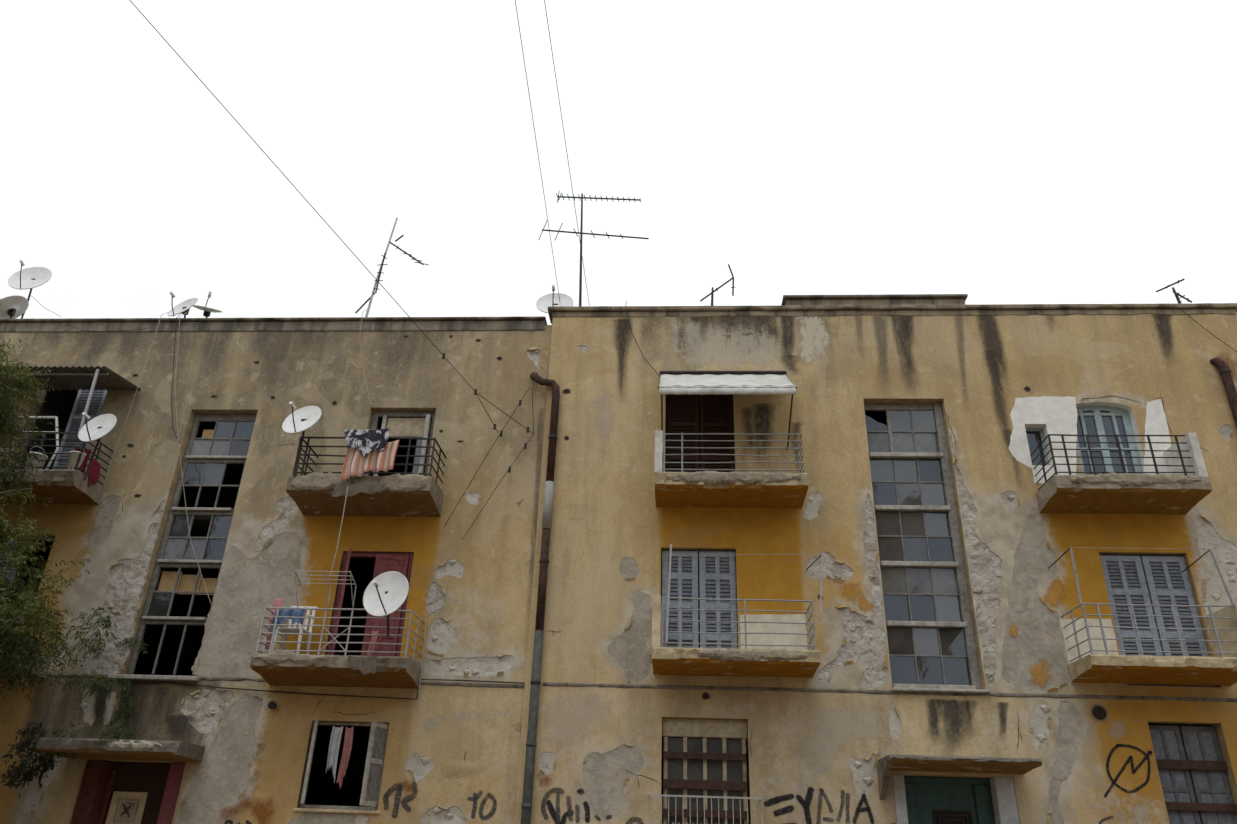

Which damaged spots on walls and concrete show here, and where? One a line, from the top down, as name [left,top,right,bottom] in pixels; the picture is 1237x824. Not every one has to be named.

water stain [617,320,629,382]
water stain [727,316,795,369]
water stain [876,316,914,374]
water stain [979,316,1006,426]
water stain [1159,308,1171,351]
flaking render [79,495,166,727]
flaking render [177,472,345,824]
flaking render [424,559,514,677]
flaking render [807,494,888,690]
flaking render [949,432,1108,824]
flaking render [1195,514,1237,616]
water stain [928,699,970,741]